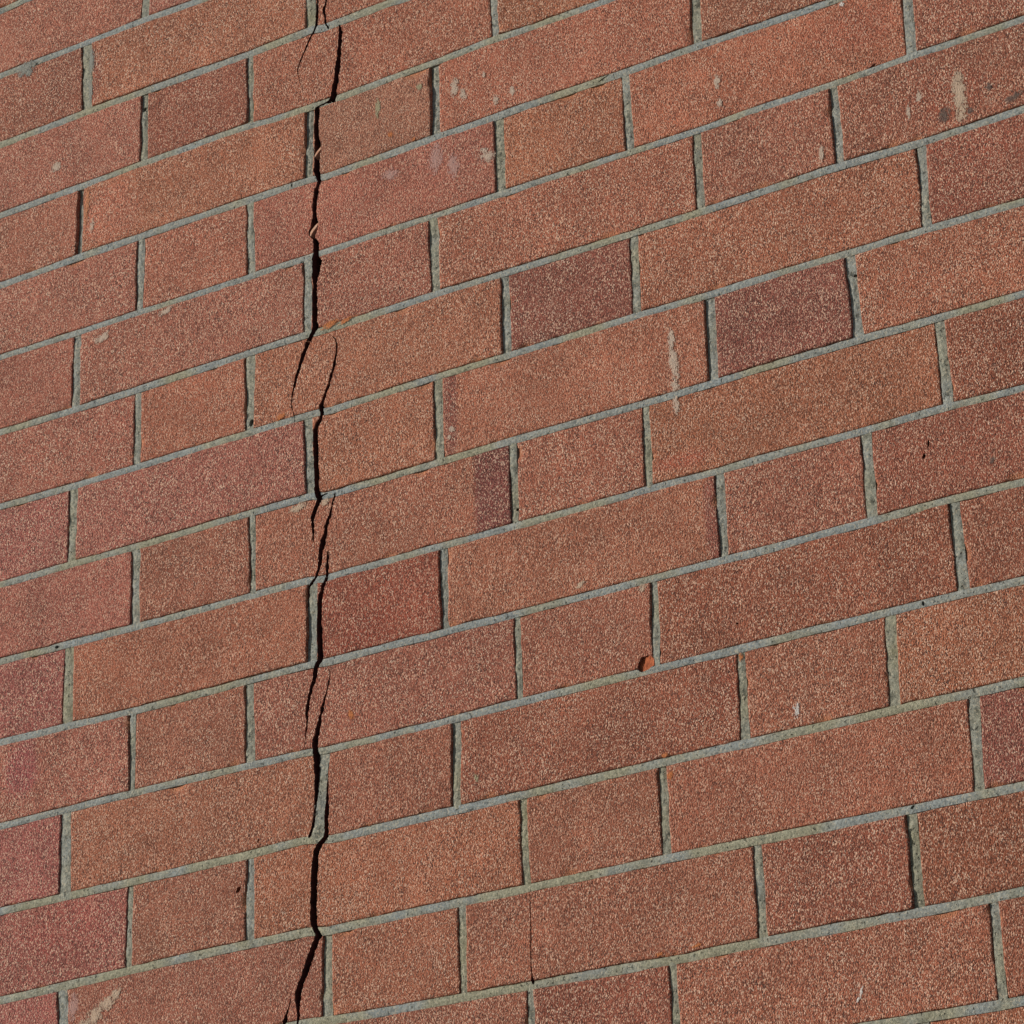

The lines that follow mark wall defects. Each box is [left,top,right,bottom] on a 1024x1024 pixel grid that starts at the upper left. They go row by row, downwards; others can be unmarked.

crack [283,0,343,1024]